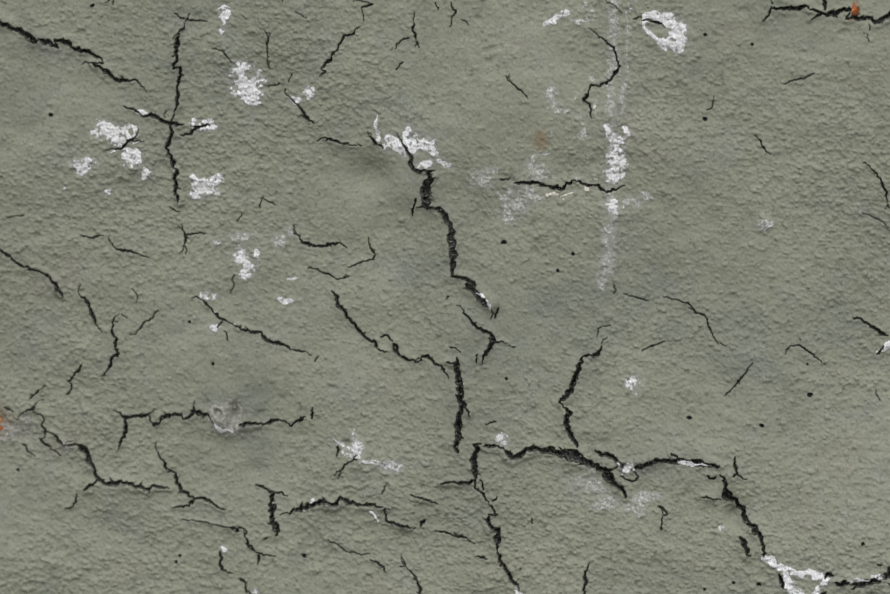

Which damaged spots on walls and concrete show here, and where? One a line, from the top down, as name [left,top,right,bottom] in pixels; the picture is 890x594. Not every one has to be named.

crack [762,0,890,37]
crack [0,21,147,92]
damp [229,62,267,106]
crack [266,33,384,149]
damp [73,157,96,176]
damp [90,119,150,180]
crack [109,15,209,252]
damp [373,115,451,169]
damp [574,0,654,289]
crack [0,135,766,594]
damp [761,556,830,594]
crack [822,564,890,594]